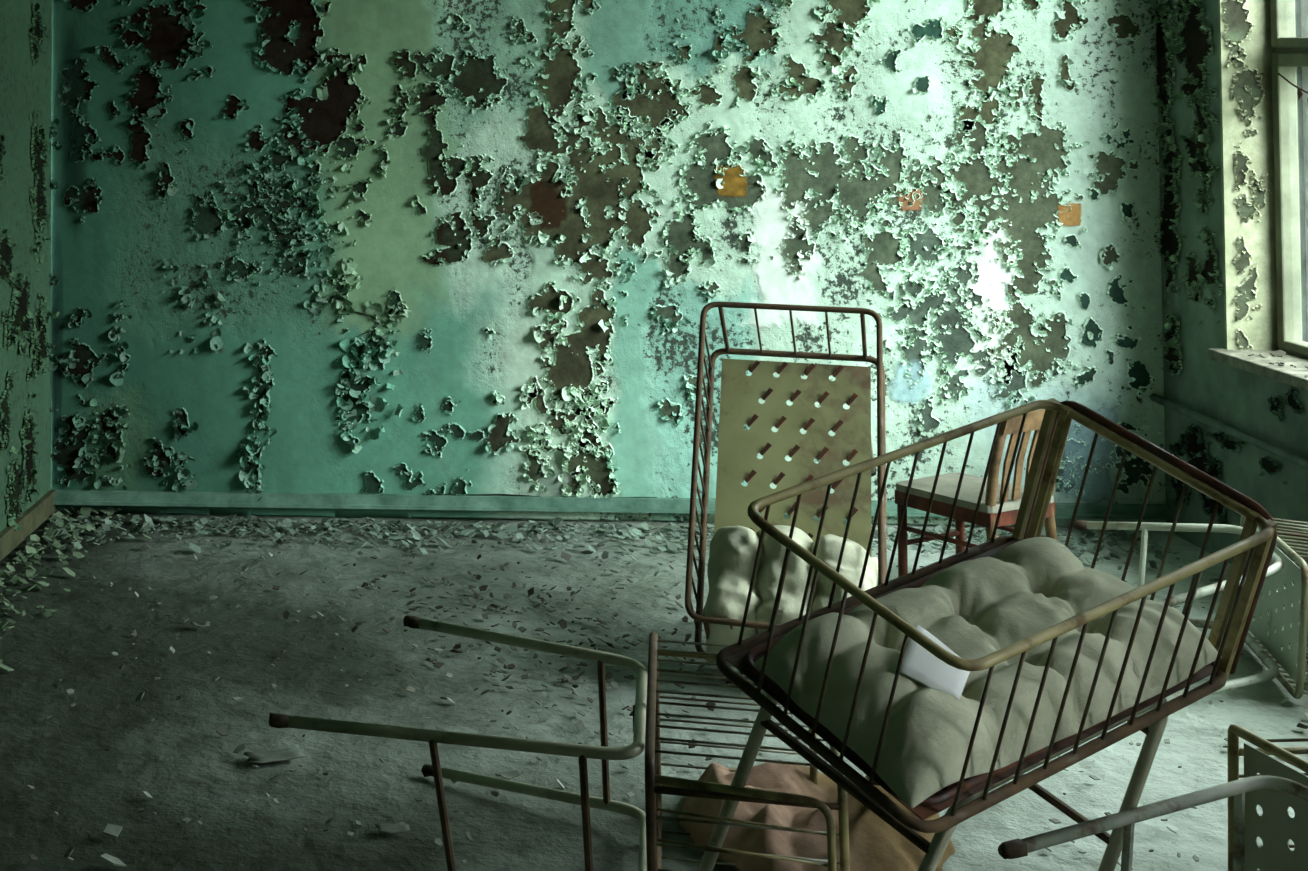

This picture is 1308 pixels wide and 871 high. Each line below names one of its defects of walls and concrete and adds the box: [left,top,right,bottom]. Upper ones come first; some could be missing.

corrosion [715,164,748,197]
corrosion [1058,203,1081,226]
peeling [0,0,1272,530]
peeling [1267,386,1303,423]
peeling [1259,455,1287,485]